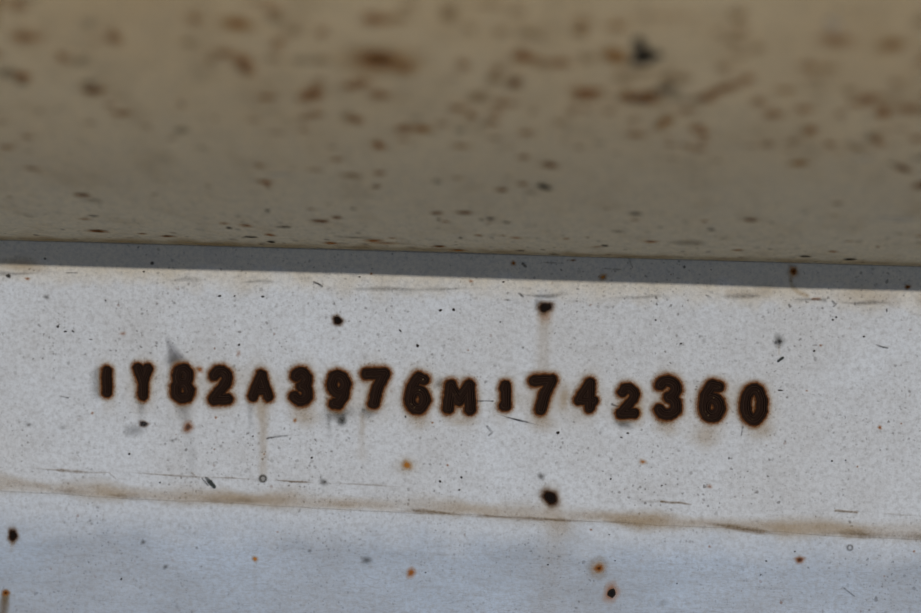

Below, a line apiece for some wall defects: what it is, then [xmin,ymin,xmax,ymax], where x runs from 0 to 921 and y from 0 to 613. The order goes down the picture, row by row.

corrosion [364,54,396,67]
corrosion [541,489,559,507]
corrosion [8,529,18,542]
corrosion [1,590,9,613]